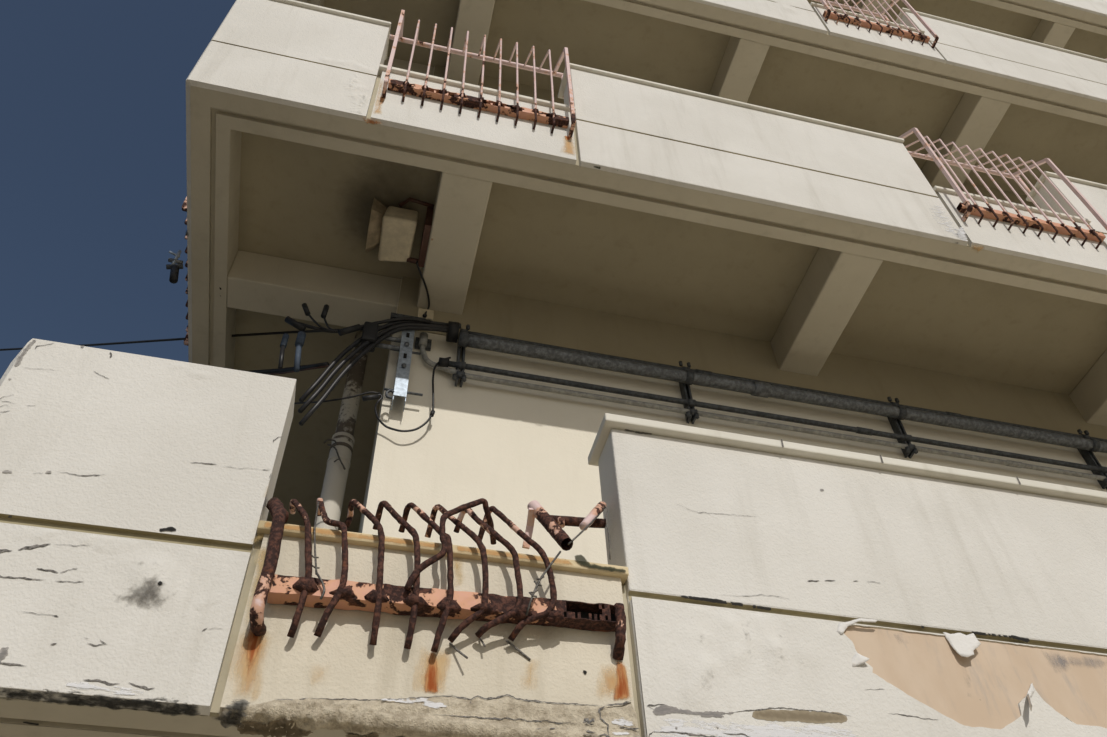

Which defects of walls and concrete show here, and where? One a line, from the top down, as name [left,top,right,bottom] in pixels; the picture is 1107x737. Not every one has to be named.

peeling [67,682,141,695]
rust [238,628,264,689]
rust [422,653,446,693]
rust [605,662,629,700]
peeling [837,618,1107,729]
spalling [221,696,640,737]
peeling [653,705,858,737]